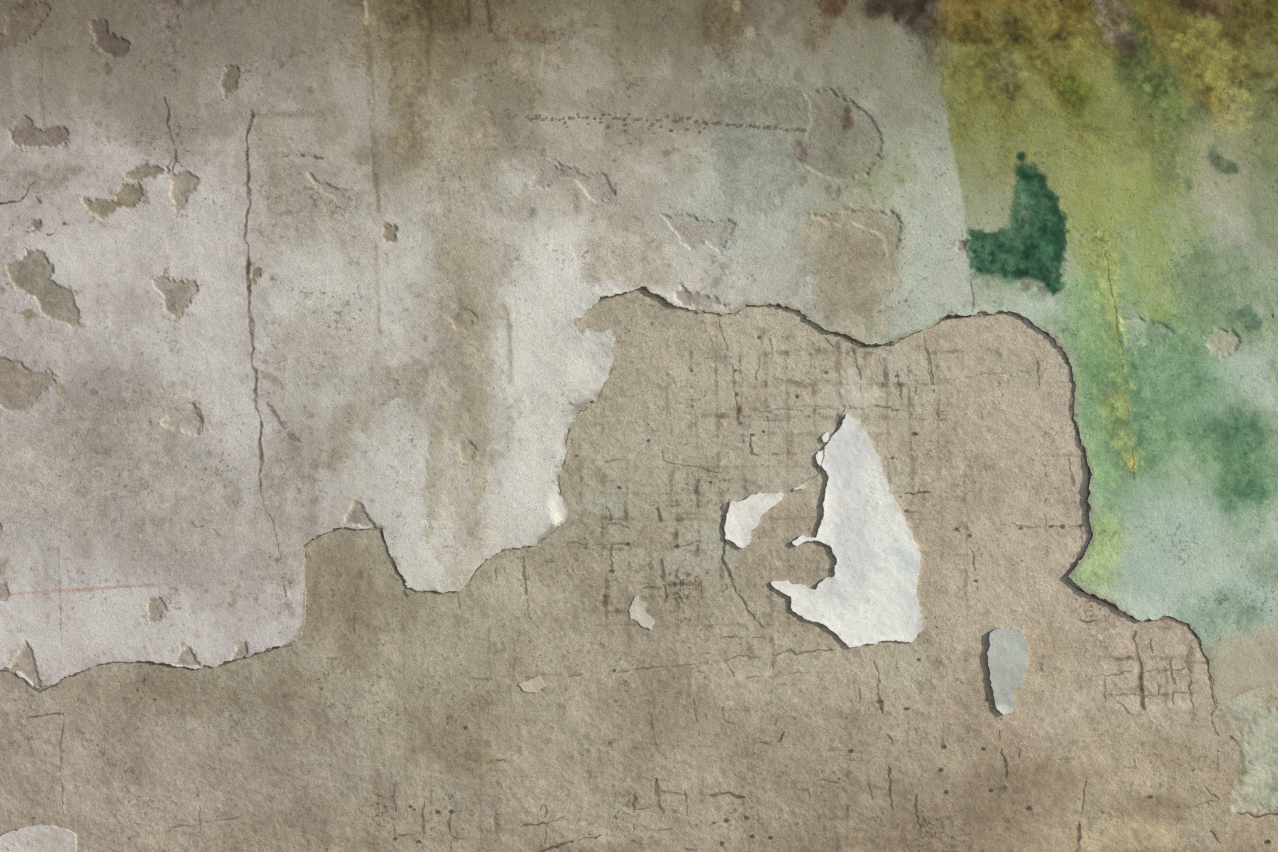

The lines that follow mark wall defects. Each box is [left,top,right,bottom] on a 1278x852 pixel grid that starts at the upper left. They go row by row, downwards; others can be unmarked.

peeling [88,8,131,76]
damp [985,14,1101,116]
damp [1140,0,1258,204]
peeling [0,112,203,227]
damp [1011,150,1058,237]
peeling [4,216,87,331]
peeling [140,265,200,322]
damp [0,0,516,666]
crack [244,109,302,597]
damp [962,270,1052,303]
flaking render [0,278,1278,852]
crack [1101,630,1239,745]